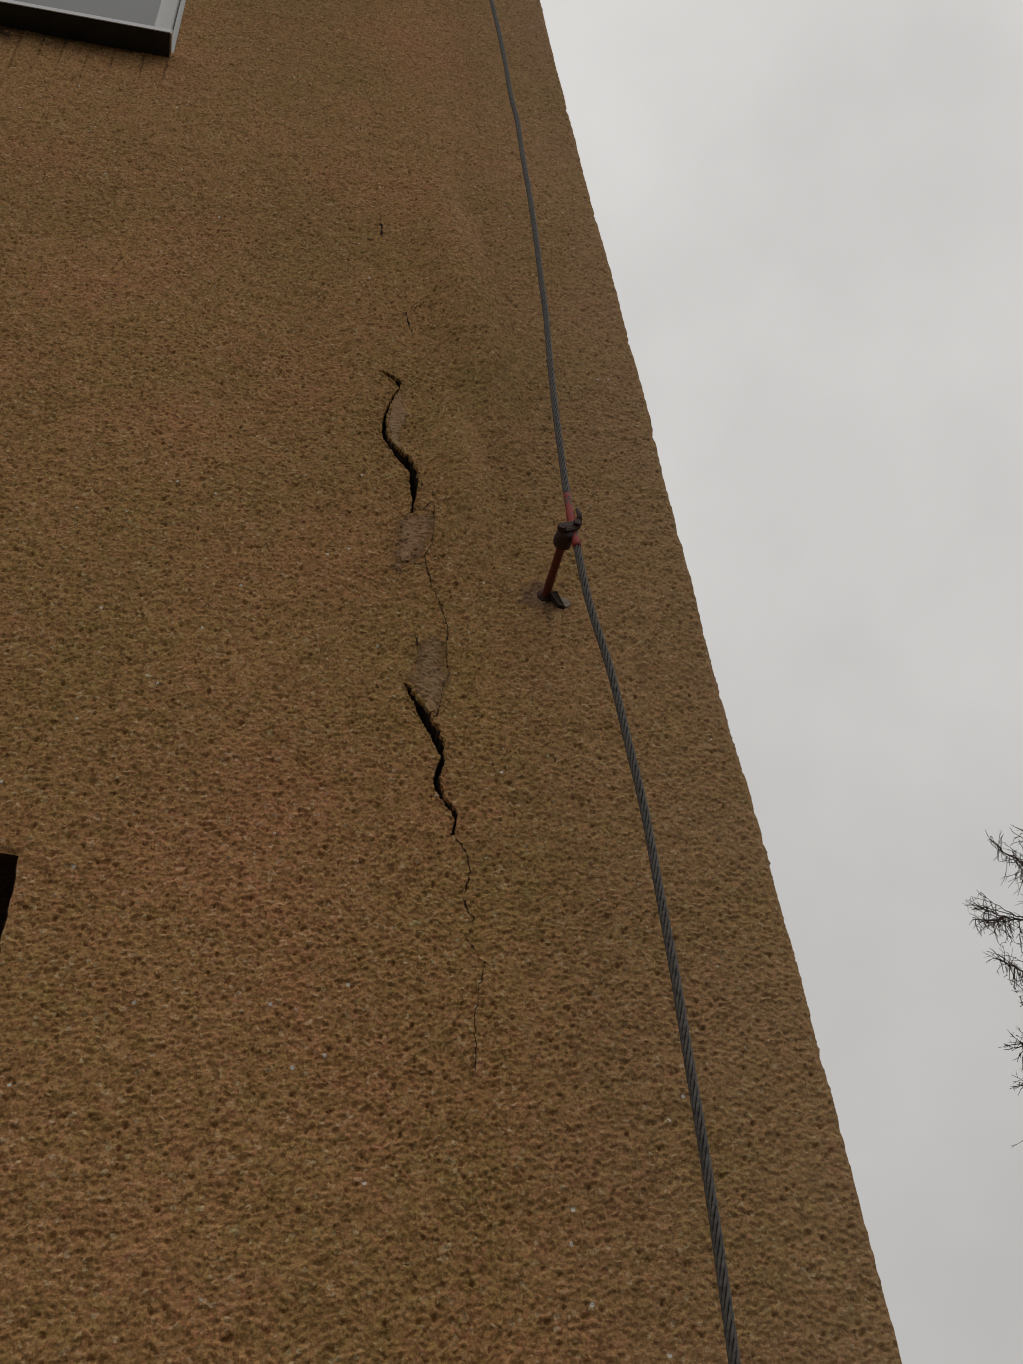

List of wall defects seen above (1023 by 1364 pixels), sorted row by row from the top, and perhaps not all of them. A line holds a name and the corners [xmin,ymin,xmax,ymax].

crack [378,369,485,1072]